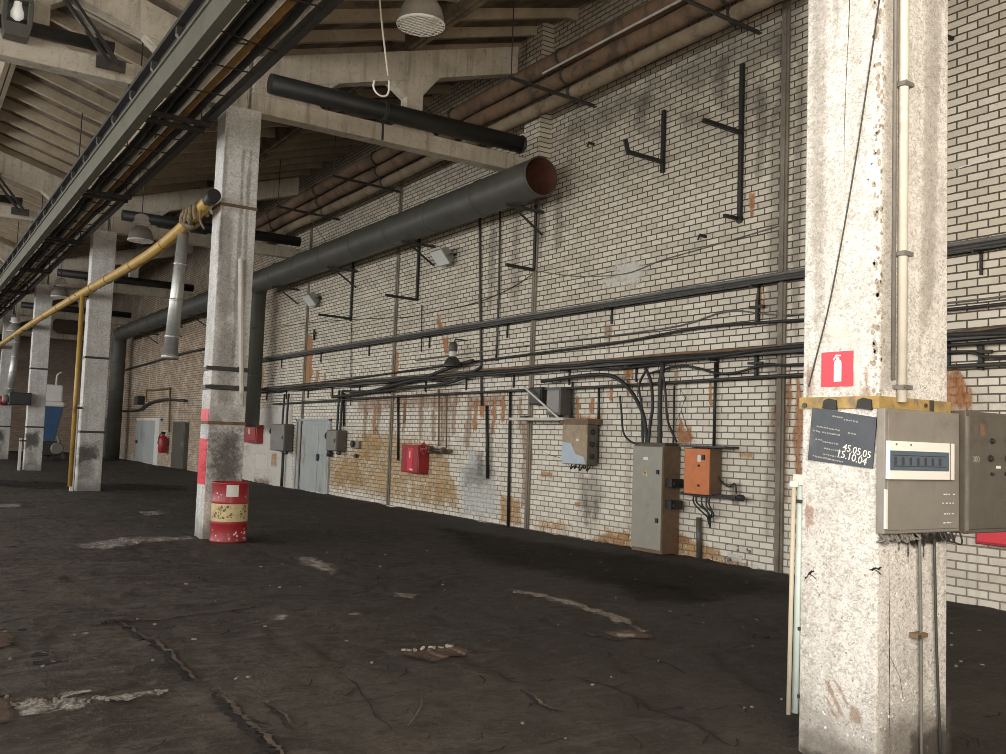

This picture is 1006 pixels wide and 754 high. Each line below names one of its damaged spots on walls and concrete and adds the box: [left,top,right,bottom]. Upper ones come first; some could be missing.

rust [305,334,334,396]
rust [472,397,506,434]
peeling [329,430,456,507]
crack [91,605,294,754]